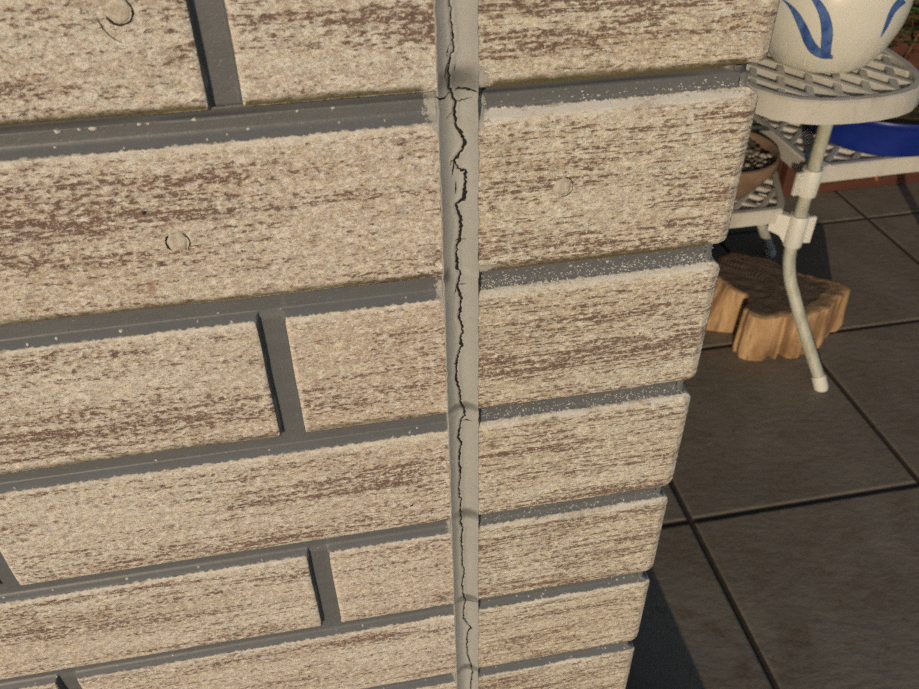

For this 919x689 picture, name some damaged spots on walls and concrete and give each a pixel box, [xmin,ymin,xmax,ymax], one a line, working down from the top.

crack [436,0,480,689]